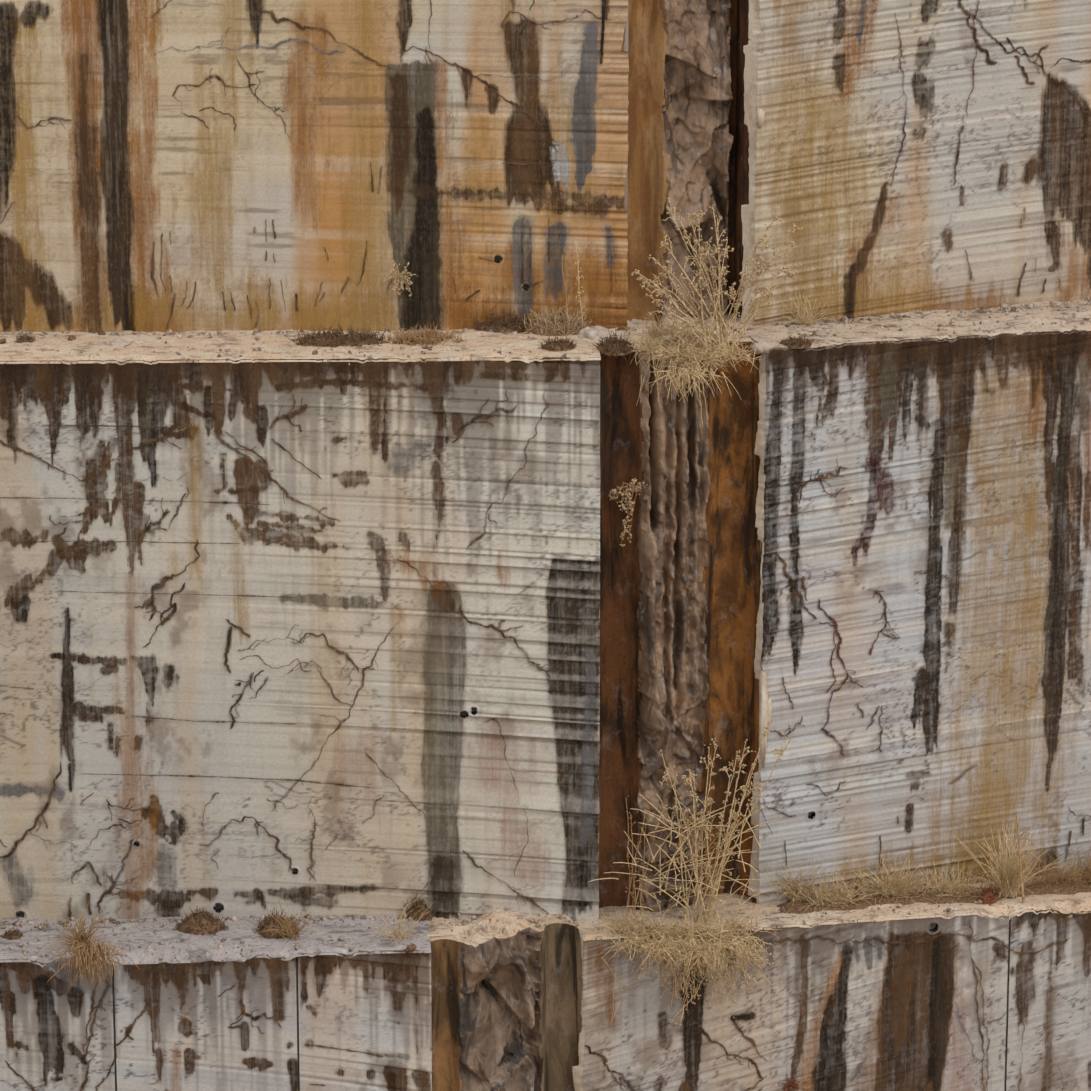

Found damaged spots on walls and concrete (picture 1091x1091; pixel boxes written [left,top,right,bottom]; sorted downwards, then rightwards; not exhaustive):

leakage [0,0,135,333]
rust [66,0,103,238]
rust [127,0,176,332]
crack [171,0,559,153]
crack [954,0,1091,185]
crack [134,540,200,647]
crack [200,619,426,881]
crack [770,554,899,796]
leakage [760,329,1091,792]
leakage [0,959,87,1085]
leakage [124,950,429,1081]
leakage [812,930,959,1091]